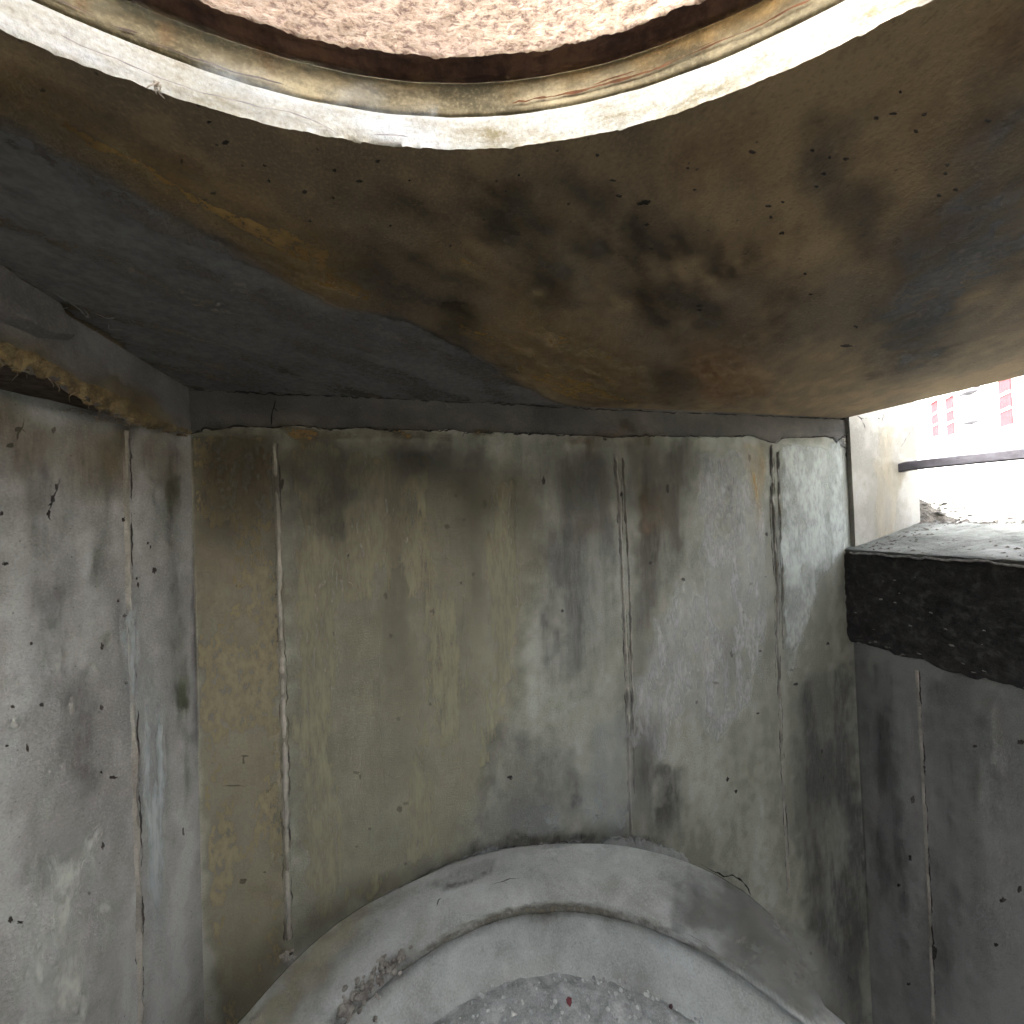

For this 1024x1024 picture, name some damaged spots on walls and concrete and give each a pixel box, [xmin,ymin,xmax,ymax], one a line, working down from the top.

spalling [0,341,192,437]
water stain [288,440,536,925]
water stain [144,720,165,907]
water stain [528,829,601,845]
water stain [685,673,903,1024]